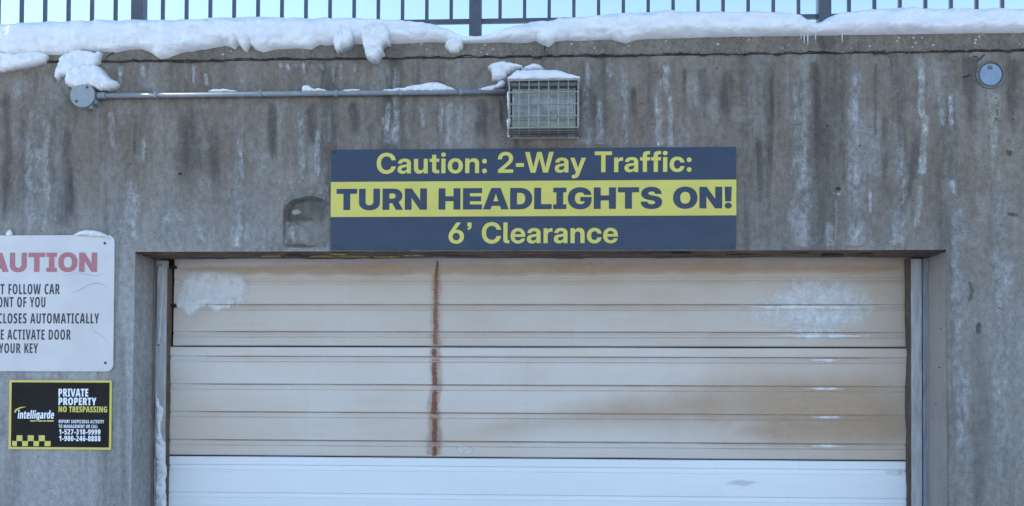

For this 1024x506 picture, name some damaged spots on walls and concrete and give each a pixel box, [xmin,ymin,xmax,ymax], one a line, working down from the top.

leakage [583,63,603,144]
leakage [789,91,809,239]
leakage [848,100,872,207]
rust [207,261,867,456]